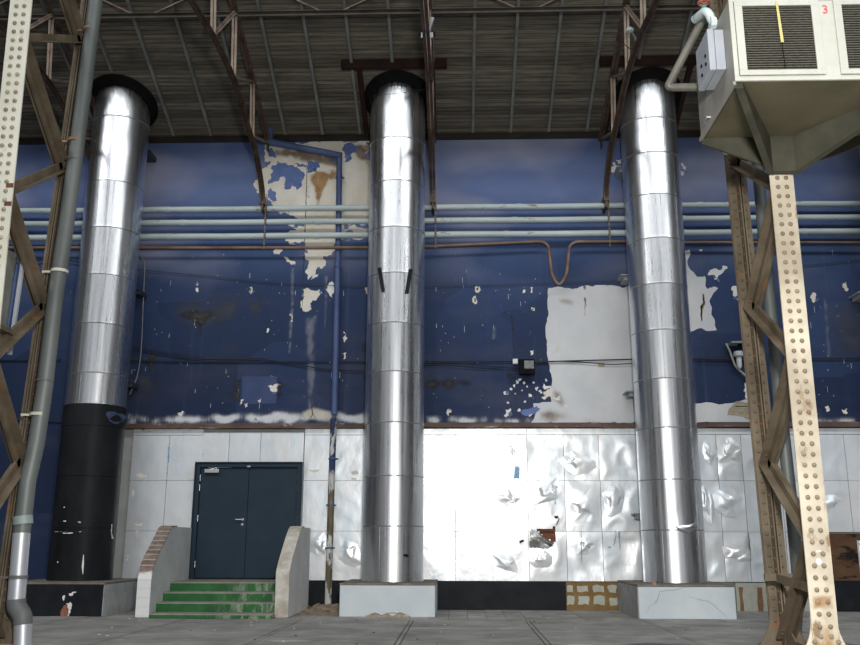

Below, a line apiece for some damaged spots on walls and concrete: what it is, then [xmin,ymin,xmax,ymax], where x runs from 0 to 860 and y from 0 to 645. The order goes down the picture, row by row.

rust [311,171,336,198]
peeling [252,141,370,312]
peeling [708,266,728,282]
damp [303,408,329,419]